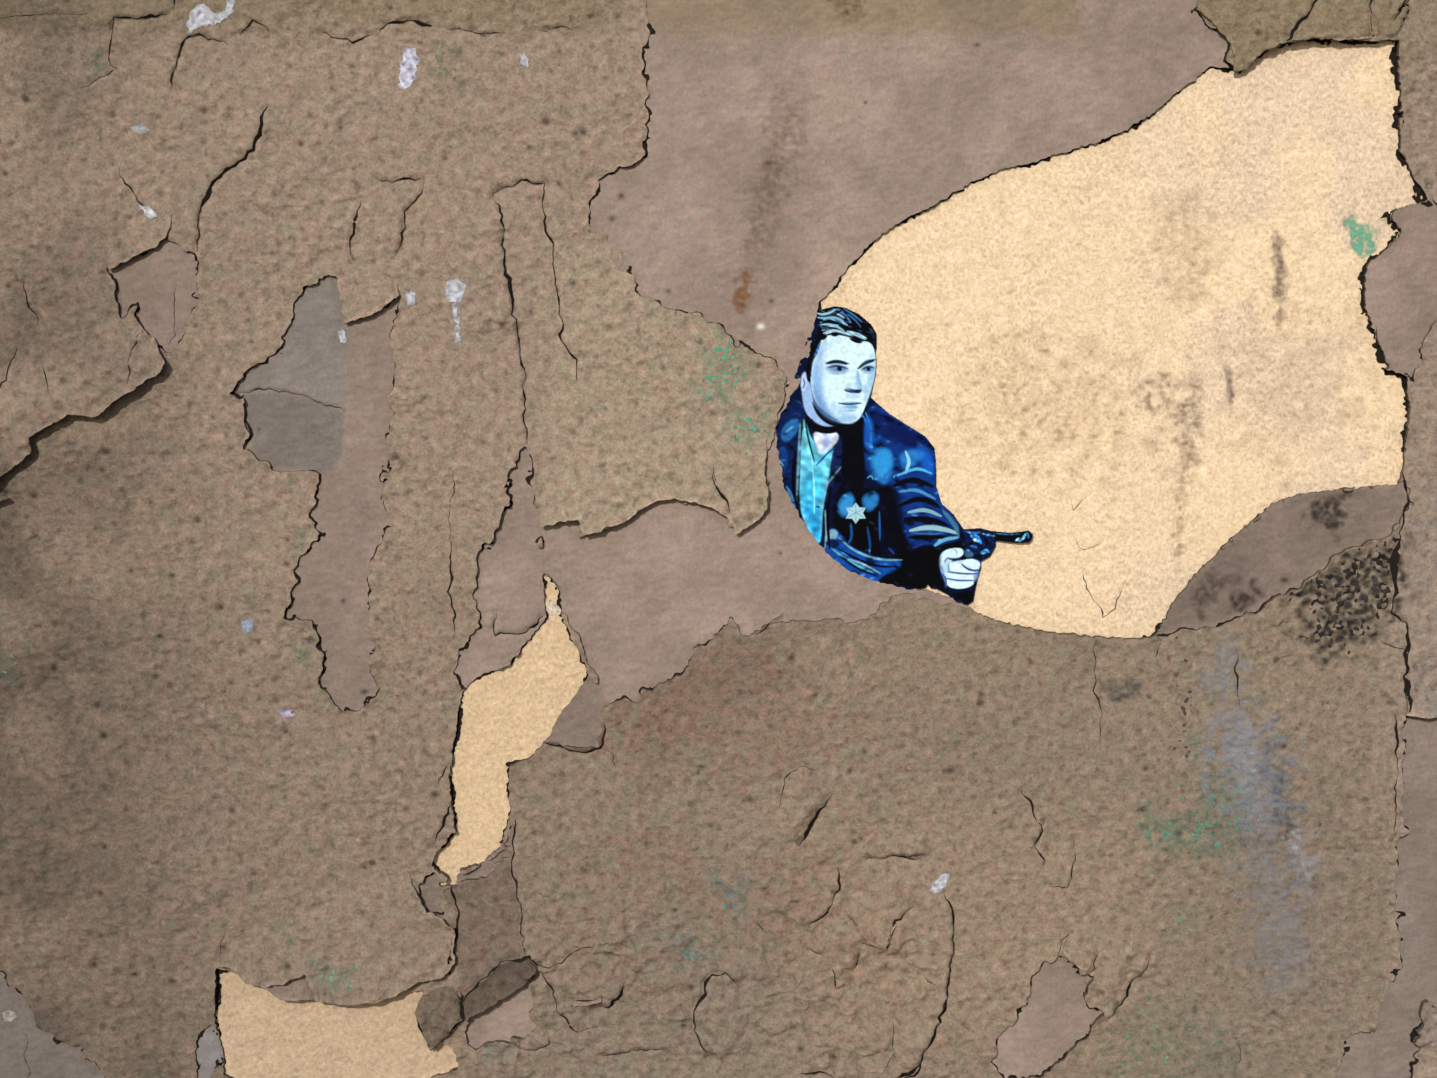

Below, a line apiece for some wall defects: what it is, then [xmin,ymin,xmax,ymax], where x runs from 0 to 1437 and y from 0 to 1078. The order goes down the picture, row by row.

crack [0,0,269,89]
peeling [185,0,235,35]
crack [196,106,268,252]
peeling [396,48,420,90]
crack [492,179,578,439]
peeling [588,0,1437,639]
peeling [231,273,416,711]
peeling [195,415,973,1078]
crack [1375,472,1413,842]
peeling [0,970,105,1078]
crack [416,820,734,1056]
crack [807,855,955,1078]